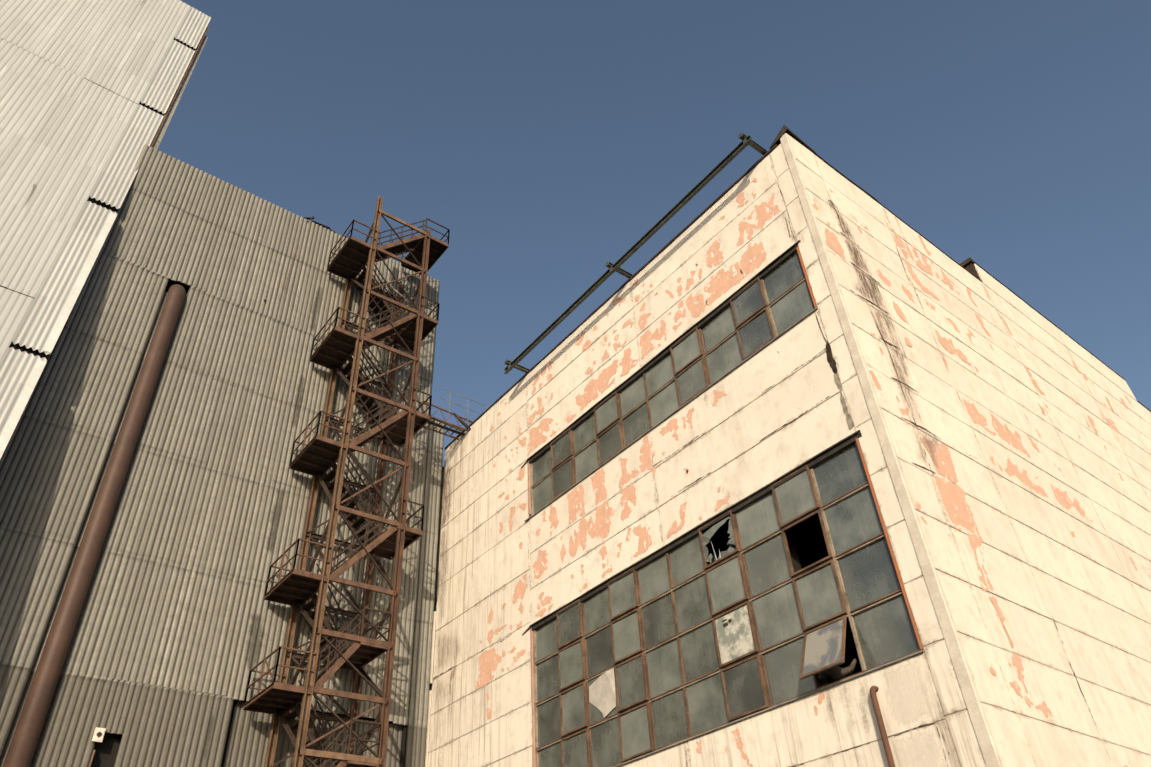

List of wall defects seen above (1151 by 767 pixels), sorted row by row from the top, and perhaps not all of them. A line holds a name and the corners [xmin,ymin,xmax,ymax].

peeling [825,221,845,259]
water stain [828,201,893,332]
peeling [876,208,996,372]
peeling [488,178,781,538]
spalling [826,343,854,429]
peeling [869,367,909,425]
peeling [962,398,1093,522]
peeling [1023,363,1048,416]
peeling [1070,394,1131,450]
peeling [476,408,694,720]
peeling [919,436,1052,721]